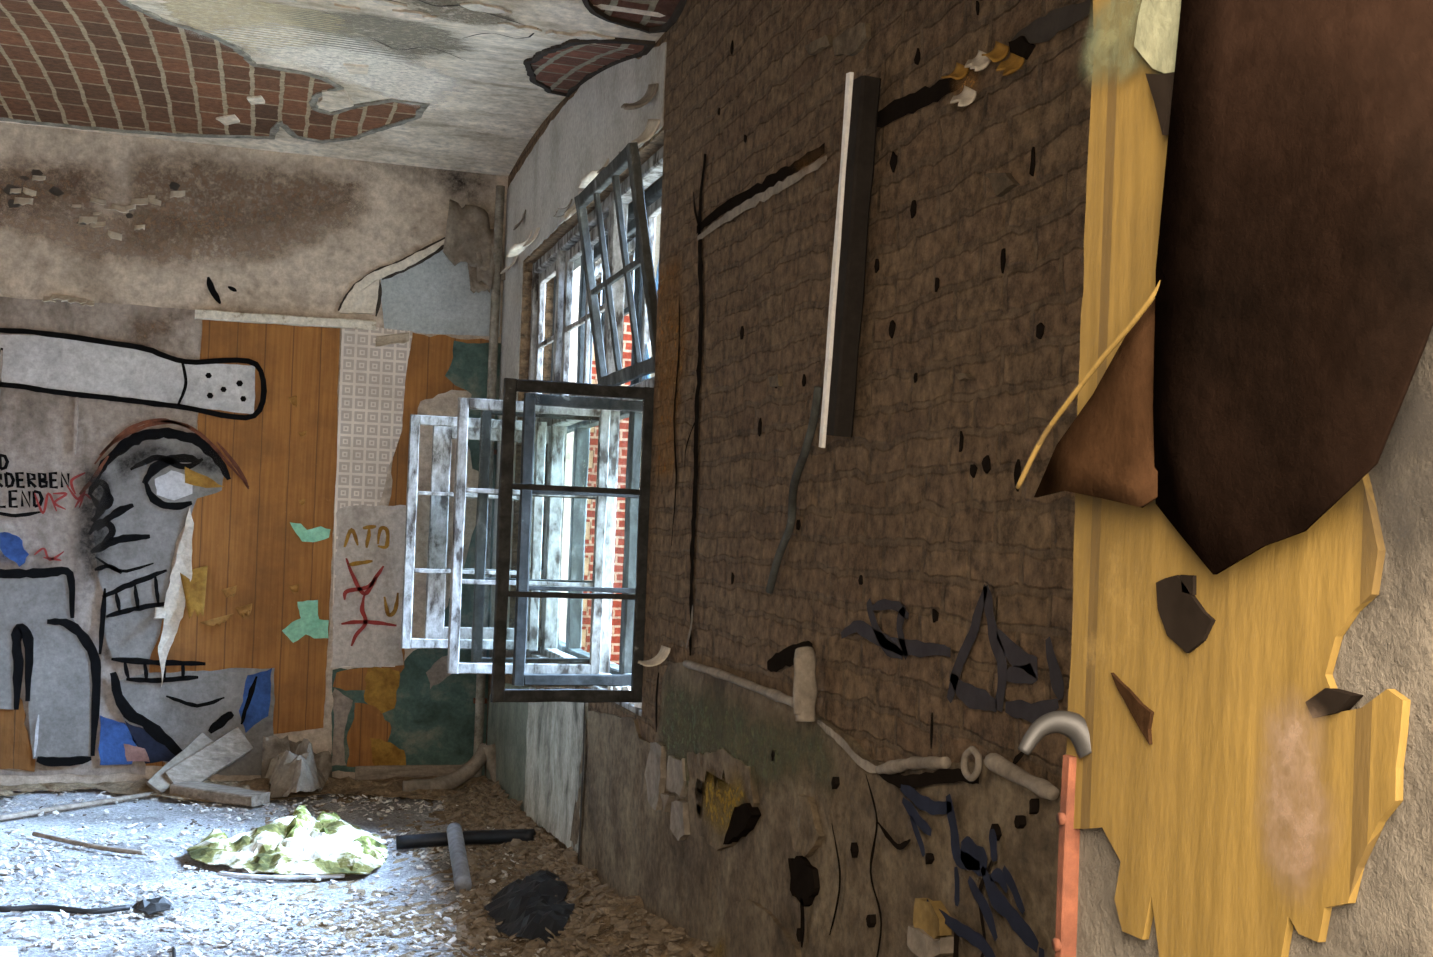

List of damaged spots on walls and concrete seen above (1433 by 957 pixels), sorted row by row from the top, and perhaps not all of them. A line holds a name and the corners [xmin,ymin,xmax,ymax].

flaking render [0,0,437,144]
flaking render [460,0,687,97]
flaking render [554,83,660,221]
damp [0,158,359,263]
peeling [338,199,540,347]
spalling [1036,323,1045,339]
spalling [959,431,991,478]
flaking render [638,641,1060,851]
flaking render [788,794,825,947]
flaking render [850,842,859,858]
flaking render [866,914,876,928]
flaking render [907,898,959,957]